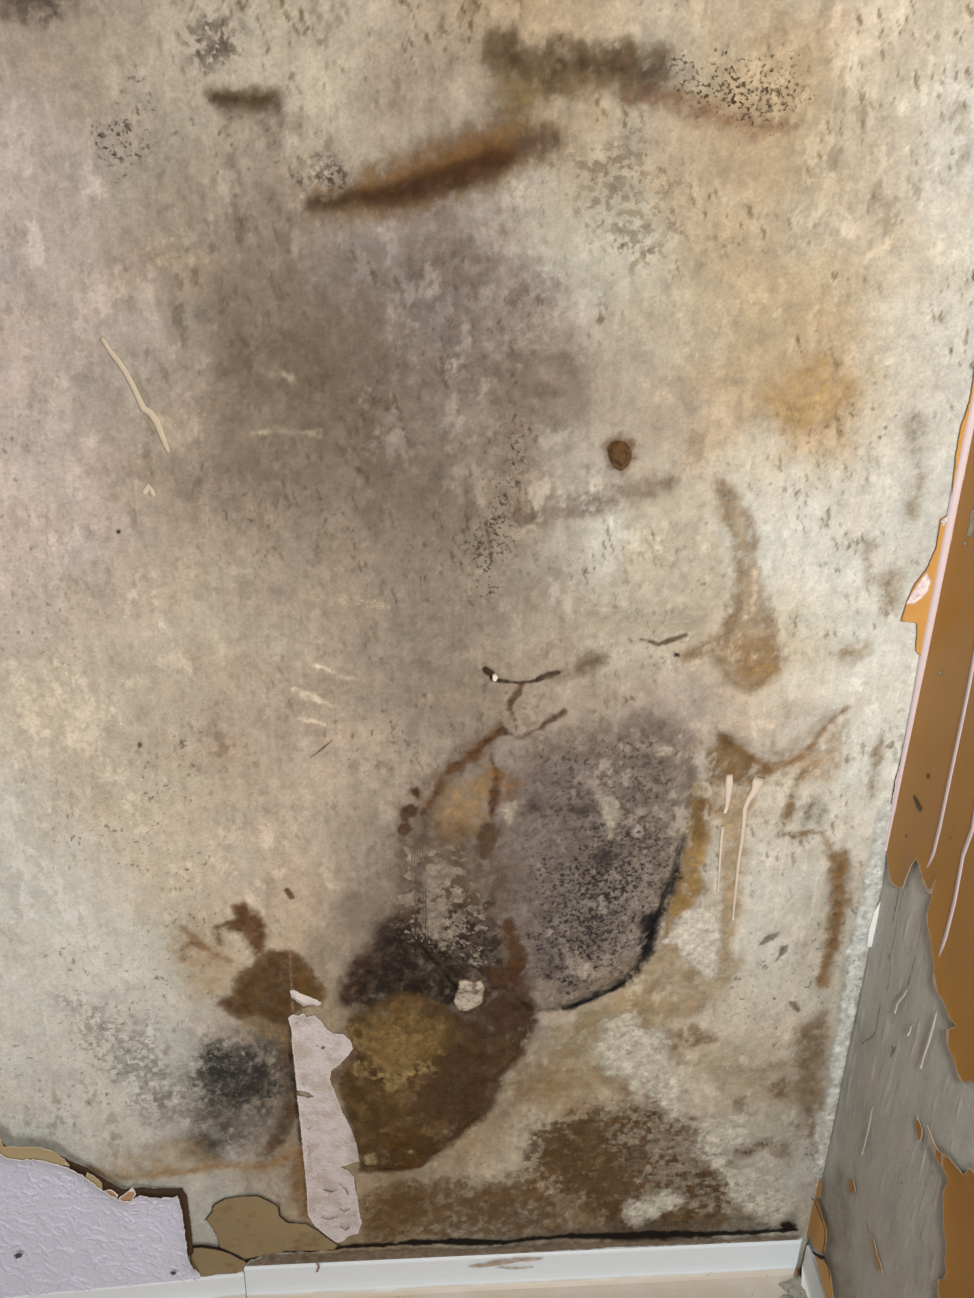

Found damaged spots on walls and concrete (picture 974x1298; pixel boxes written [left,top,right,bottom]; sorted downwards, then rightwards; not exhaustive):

rust [310,122,558,211]
water stain [483,32,812,129]
crack [648,634,687,646]
water stain [683,481,779,691]
water stain [88,904,324,1218]
water stain [340,708,850,1237]
peeling [814,798,892,1186]
crack [246,1221,798,1262]